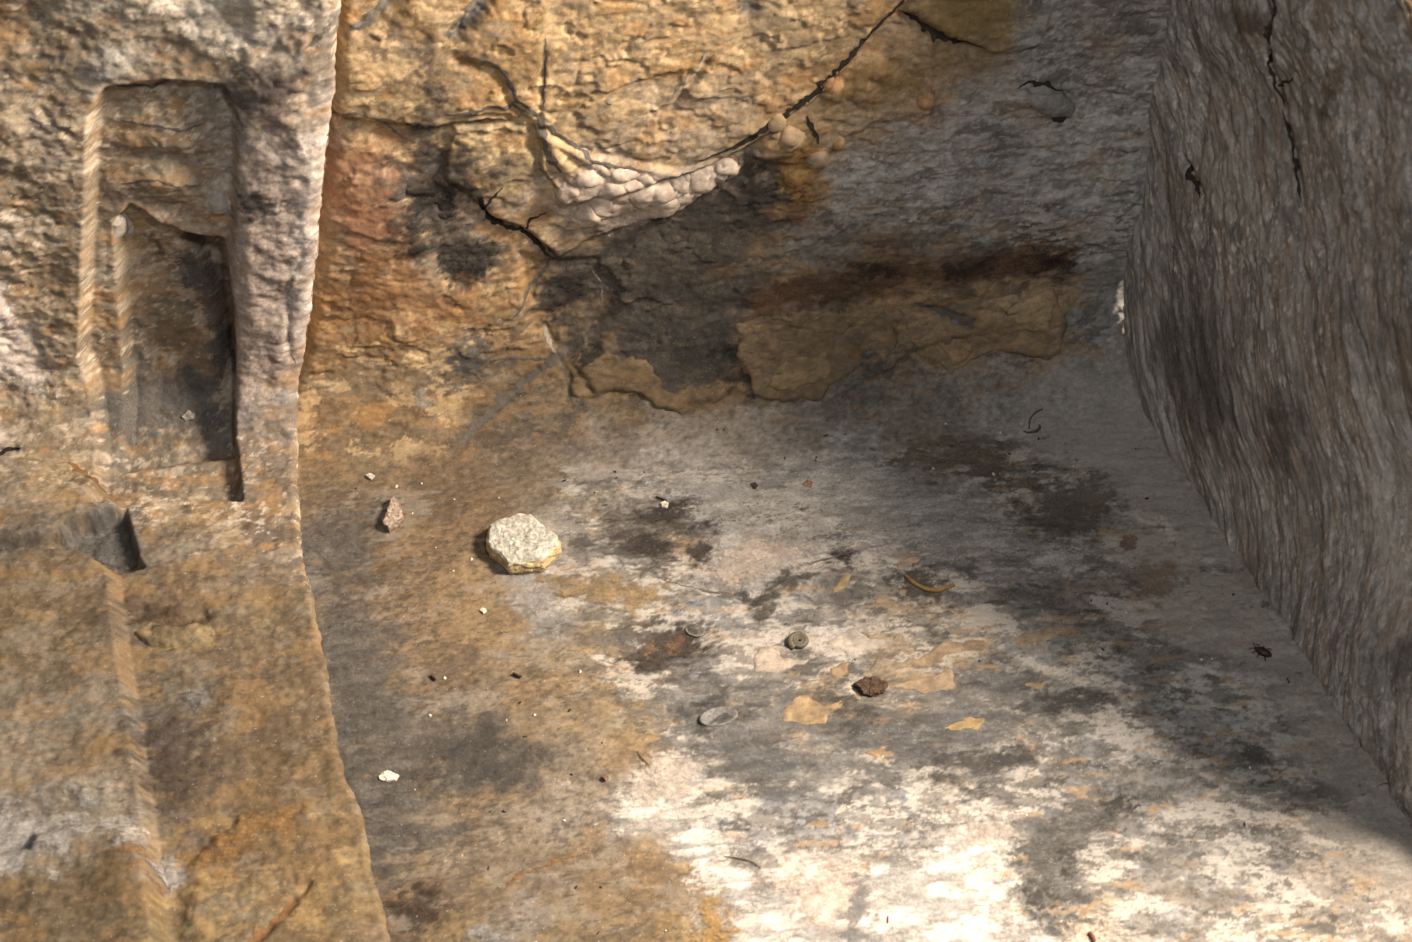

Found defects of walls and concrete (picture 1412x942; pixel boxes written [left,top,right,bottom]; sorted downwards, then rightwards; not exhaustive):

crack [306,23,331,49]
crack [331,111,405,140]
crack [446,38,652,173]
crack [692,0,986,162]
crack [1263,0,1309,204]
damp [398,198,500,291]
damp [550,155,780,236]
crack [453,184,641,455]
damp [706,340,754,398]
damp [535,435,1128,621]
damp [612,620,1178,942]